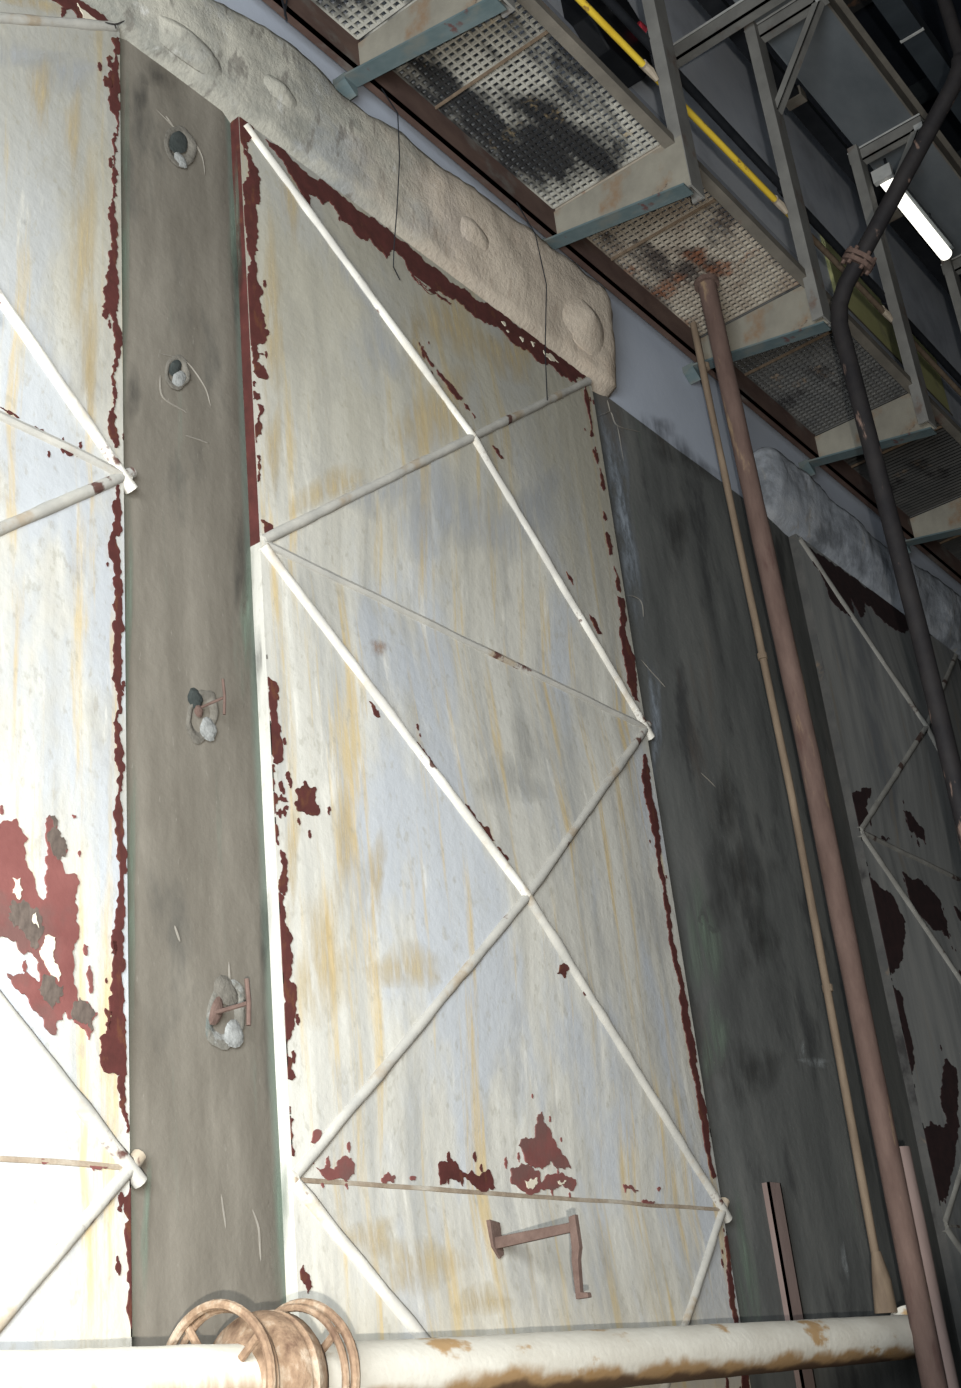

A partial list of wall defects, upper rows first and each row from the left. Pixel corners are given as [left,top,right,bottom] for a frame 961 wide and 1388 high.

peeling [52,0,108,21]
peeling [97,37,124,448]
peeling [239,117,606,491]
peeling [603,511,640,702]
peeling [0,485,130,1133]
peeling [267,677,331,1080]
peeling [866,862,961,1087]
peeling [311,1129,322,1144]
peeling [313,1141,355,1189]
peeling [438,1094,577,1198]
peeling [922,1045,960,1206]
peeling [300,1265,313,1293]